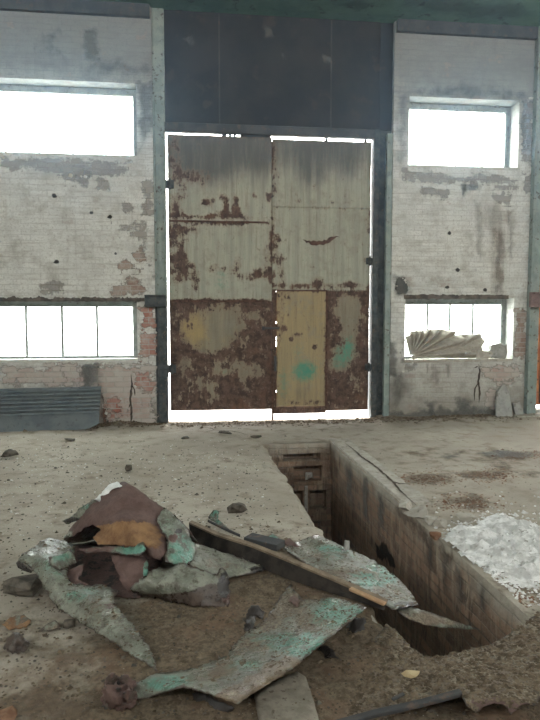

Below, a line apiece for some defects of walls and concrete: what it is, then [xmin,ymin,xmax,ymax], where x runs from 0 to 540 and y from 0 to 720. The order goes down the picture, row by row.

spalling [0,248,159,423]
crack [128,376,136,421]
crack [473,366,481,400]